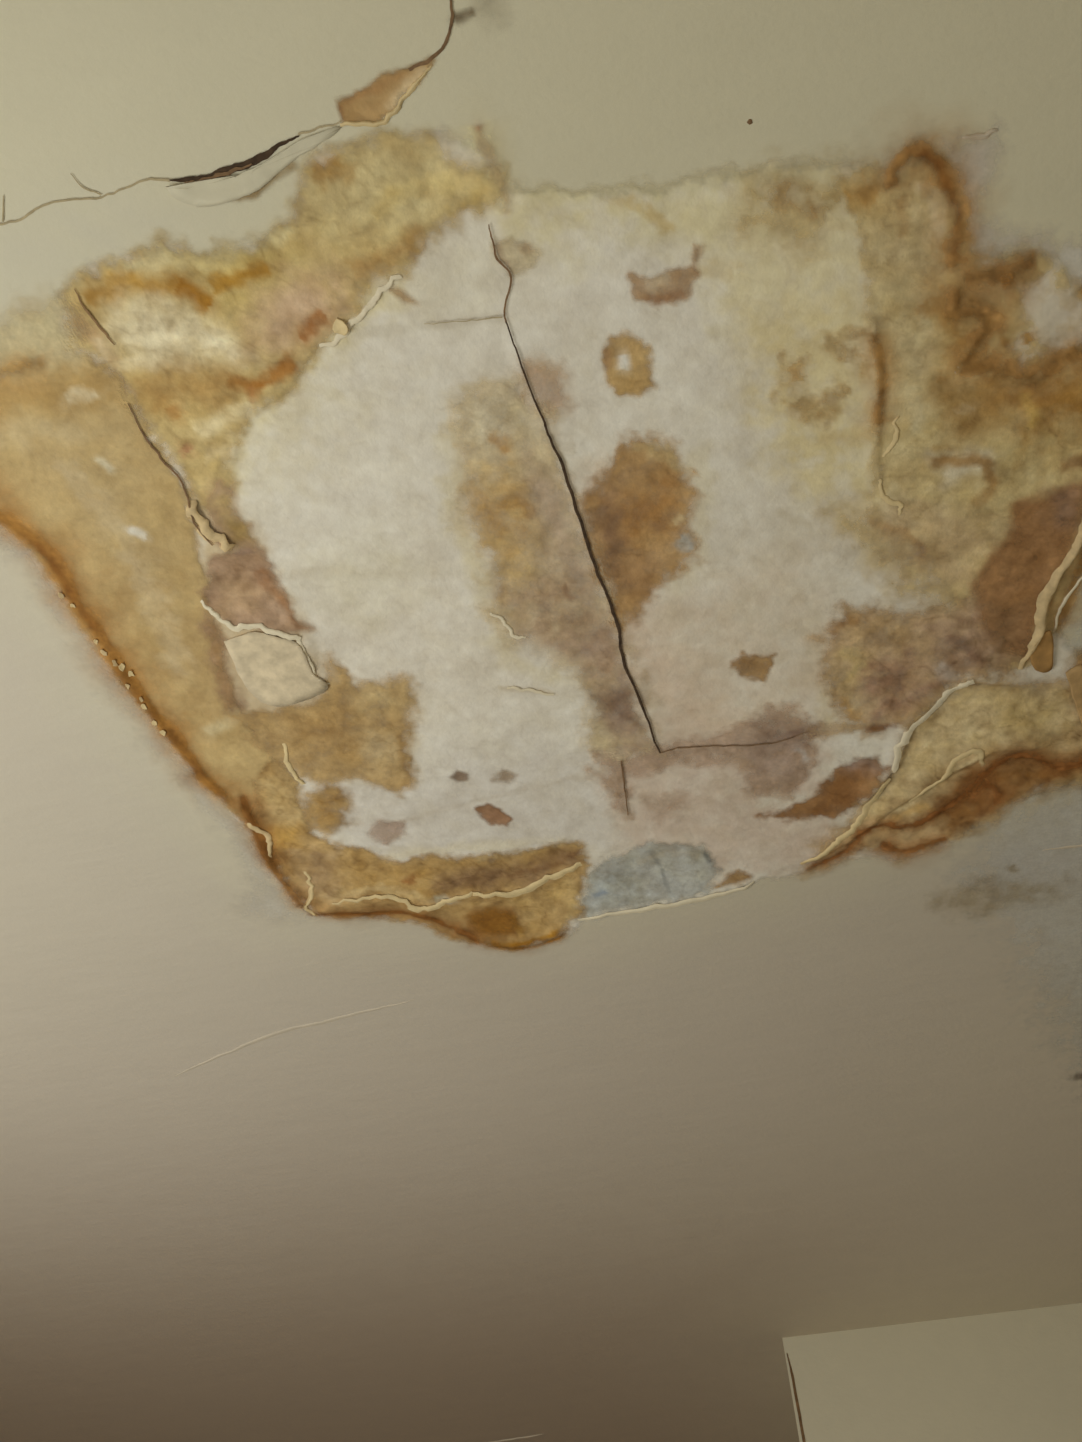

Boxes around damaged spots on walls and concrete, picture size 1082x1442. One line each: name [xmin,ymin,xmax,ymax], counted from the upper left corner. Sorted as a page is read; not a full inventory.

crack [408,0,454,71]
peeling [338,60,433,142]
crack [0,121,341,226]
damp [0,126,590,951]
peeling [133,131,1082,946]
crack [426,224,807,753]
damp [455,139,1082,871]
crack [620,761,628,815]
damp [715,871,750,888]